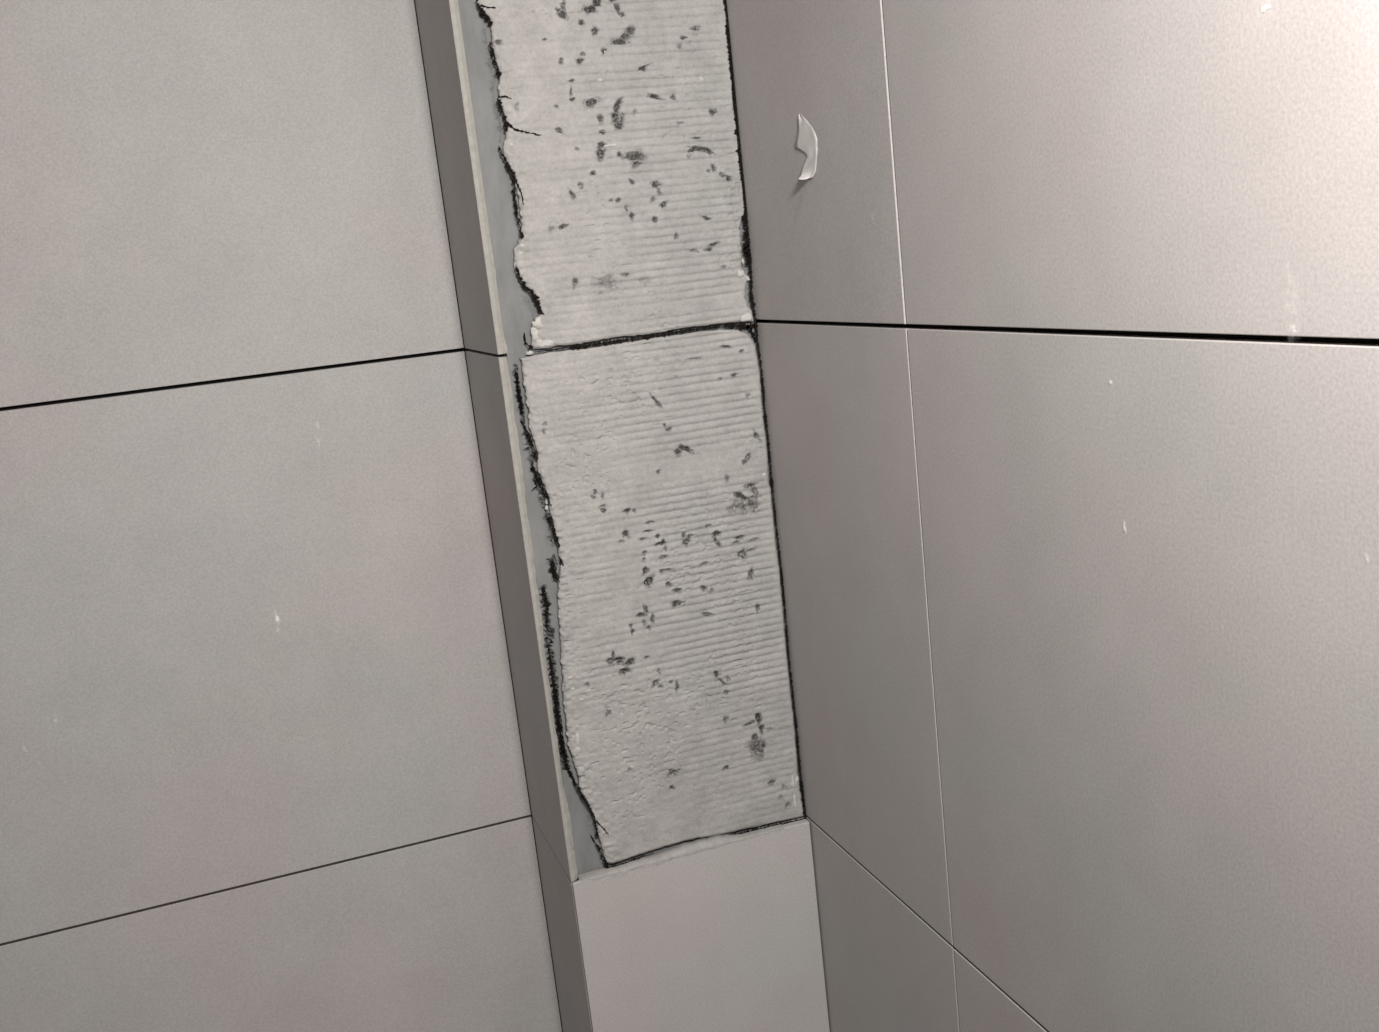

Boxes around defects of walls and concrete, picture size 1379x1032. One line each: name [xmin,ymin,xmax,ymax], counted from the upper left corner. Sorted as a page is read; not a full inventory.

spalling [557,0,633,54]
spalling [556,79,643,197]
spalling [623,521,683,607]
spalling [607,652,648,674]
spalling [745,713,765,755]